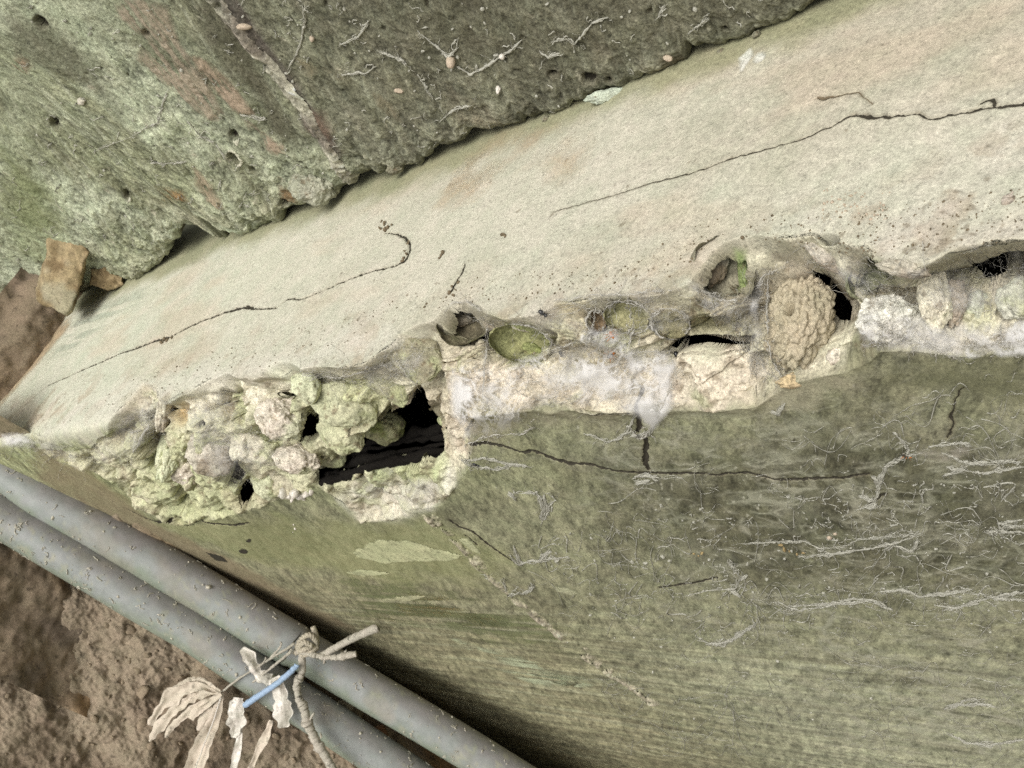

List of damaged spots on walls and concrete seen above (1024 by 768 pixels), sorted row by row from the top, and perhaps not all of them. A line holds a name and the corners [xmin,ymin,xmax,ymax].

crack [560,92,1024,210]
crack [26,233,411,405]
spalling [44,232,1024,526]
crack [468,387,886,503]